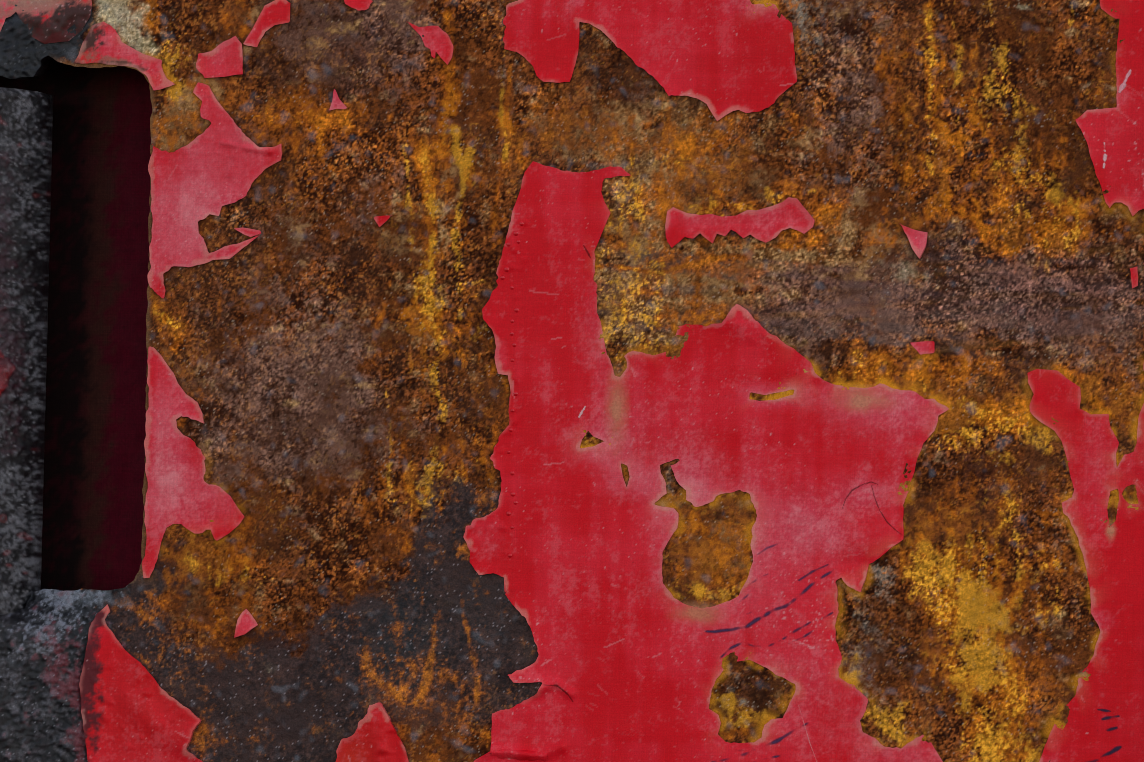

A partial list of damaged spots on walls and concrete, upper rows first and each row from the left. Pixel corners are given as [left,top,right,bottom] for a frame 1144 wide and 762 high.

rust [64,0,611,657]
peeling [749,382,794,401]
rust [591,0,1144,762]
peeling [79,604,203,762]
peeling [336,702,409,762]
rust [397,723,492,762]